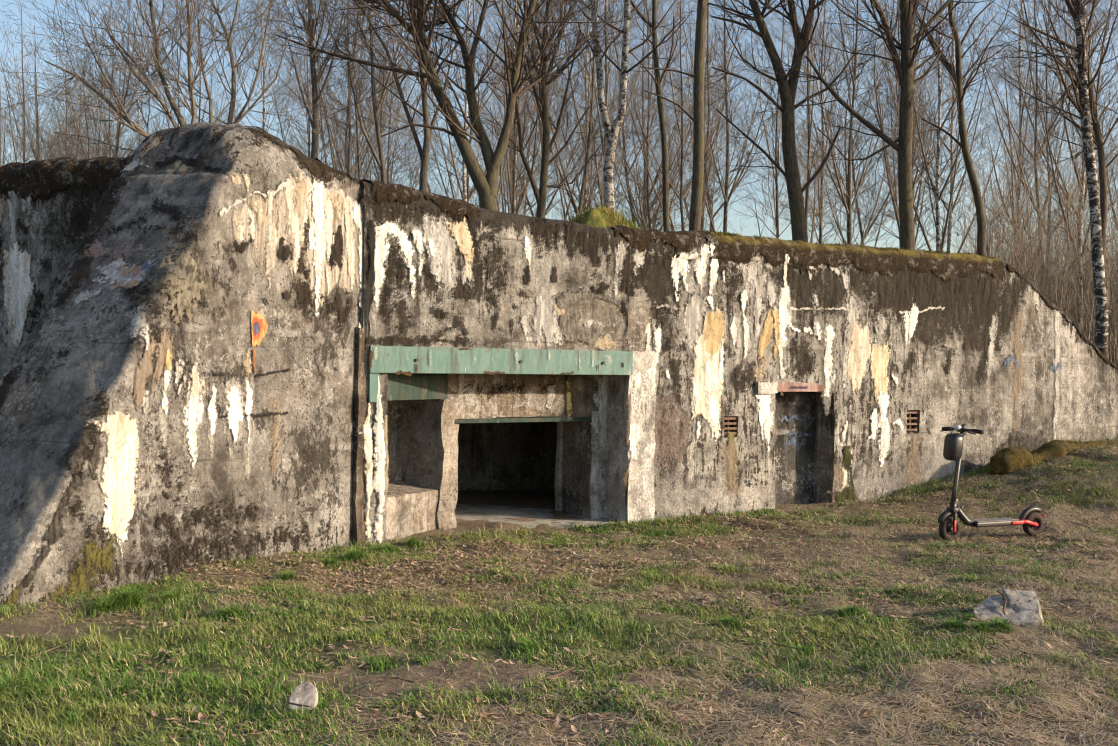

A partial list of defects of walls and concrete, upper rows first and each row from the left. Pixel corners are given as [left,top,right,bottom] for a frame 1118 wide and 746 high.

damp [225,169,475,360]
damp [629,417,642,460]
damp [634,242,919,474]
damp [986,312,998,384]